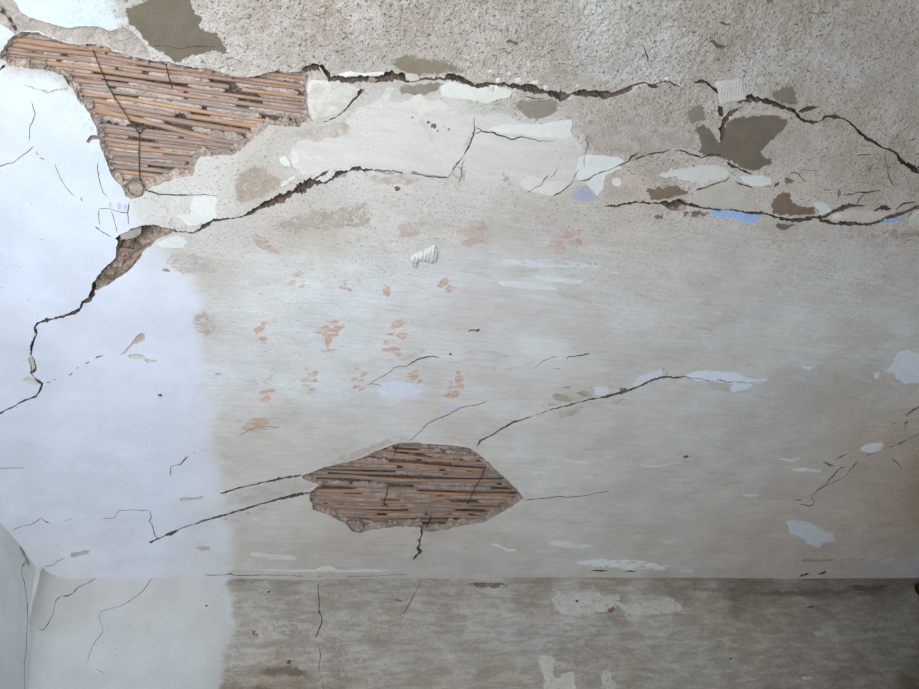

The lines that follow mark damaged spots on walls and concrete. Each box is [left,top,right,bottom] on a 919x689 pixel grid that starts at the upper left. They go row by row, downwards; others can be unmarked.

flaking render [0,0,350,203]
crack [302,63,919,226]
crack [103,475,309,543]
flaking render [233,446,524,533]
crack [477,367,758,446]
peeling [785,520,837,548]
crack [798,406,919,507]
crack [293,575,324,689]